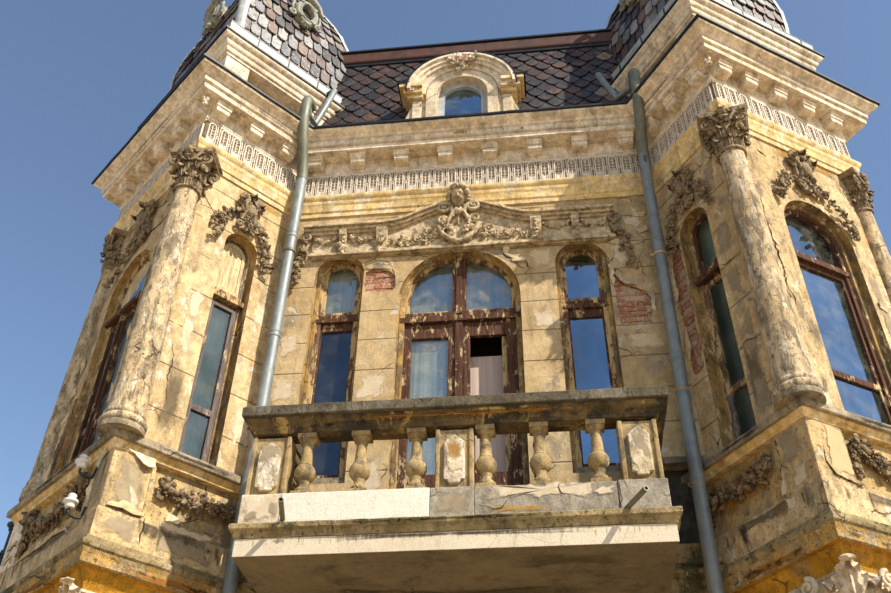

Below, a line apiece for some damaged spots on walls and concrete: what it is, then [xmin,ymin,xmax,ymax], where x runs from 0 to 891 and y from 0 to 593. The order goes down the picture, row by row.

flaking render [365,257,399,292]
flaking render [608,239,665,347]
flaking render [671,245,704,375]
spalling [449,444,462,471]
peeling [489,481,613,511]